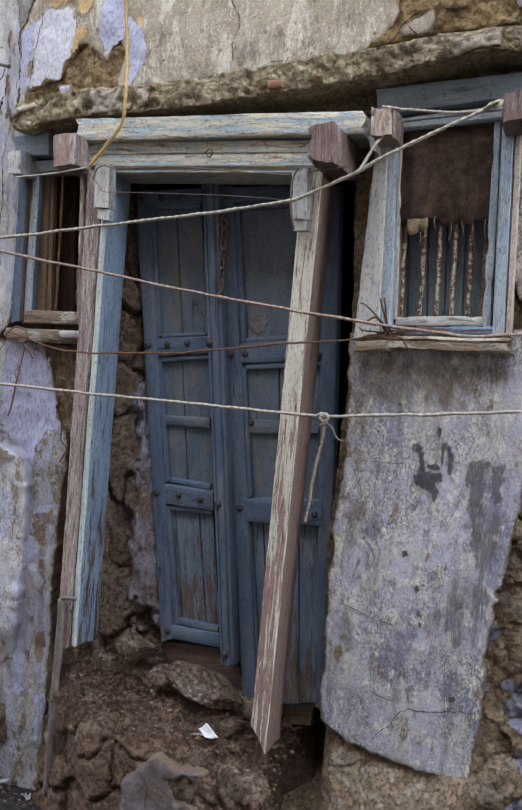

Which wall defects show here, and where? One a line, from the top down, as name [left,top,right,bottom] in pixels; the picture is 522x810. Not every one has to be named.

peeling [17,0,148,103]
crack [222,1,291,69]
flaking render [32,504,57,545]
crack [362,708,474,751]